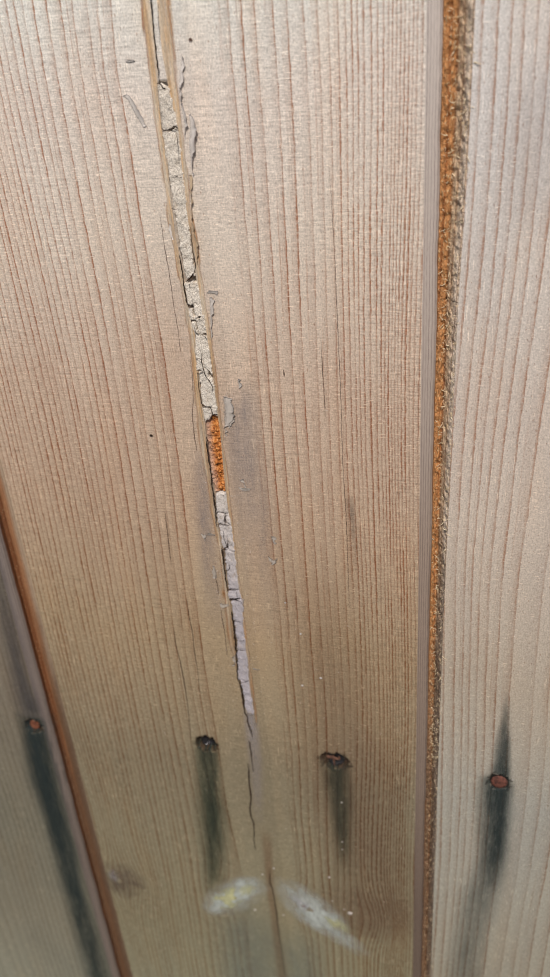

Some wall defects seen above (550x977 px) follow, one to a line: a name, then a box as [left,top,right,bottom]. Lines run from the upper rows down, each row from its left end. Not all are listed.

crack [141,0,257,850]
spalling [206,415,226,491]
crack [269,875,285,972]